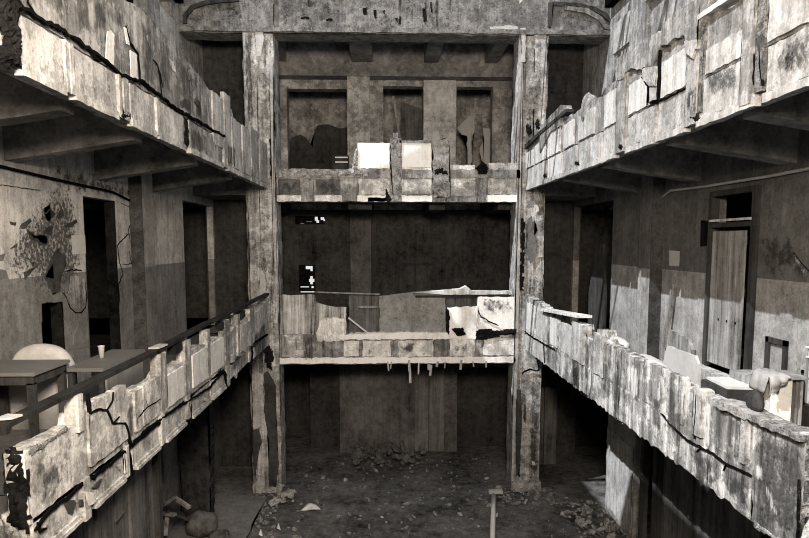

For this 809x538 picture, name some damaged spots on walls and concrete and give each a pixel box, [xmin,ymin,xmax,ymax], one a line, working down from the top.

spalling [0,0,23,71]
crack [15,0,226,137]
peeling [0,203,86,322]
spalling [0,426,68,538]
crack [34,371,228,533]
crack [660,395,752,476]
spalling [754,520,779,538]
spalling [801,440,809,538]